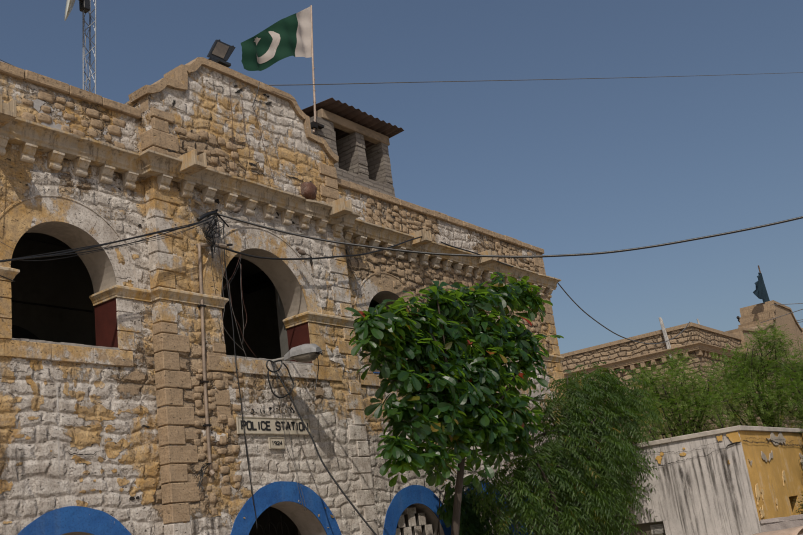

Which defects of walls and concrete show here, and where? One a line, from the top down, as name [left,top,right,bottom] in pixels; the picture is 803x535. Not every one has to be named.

peeling [168,95,194,115]
spalling [178,125,220,163]
peeling [217,102,291,175]
peeling [0,358,47,440]
peeling [227,385,244,404]
peeling [62,367,158,507]
peeling [202,426,229,442]
peeling [761,432,786,462]